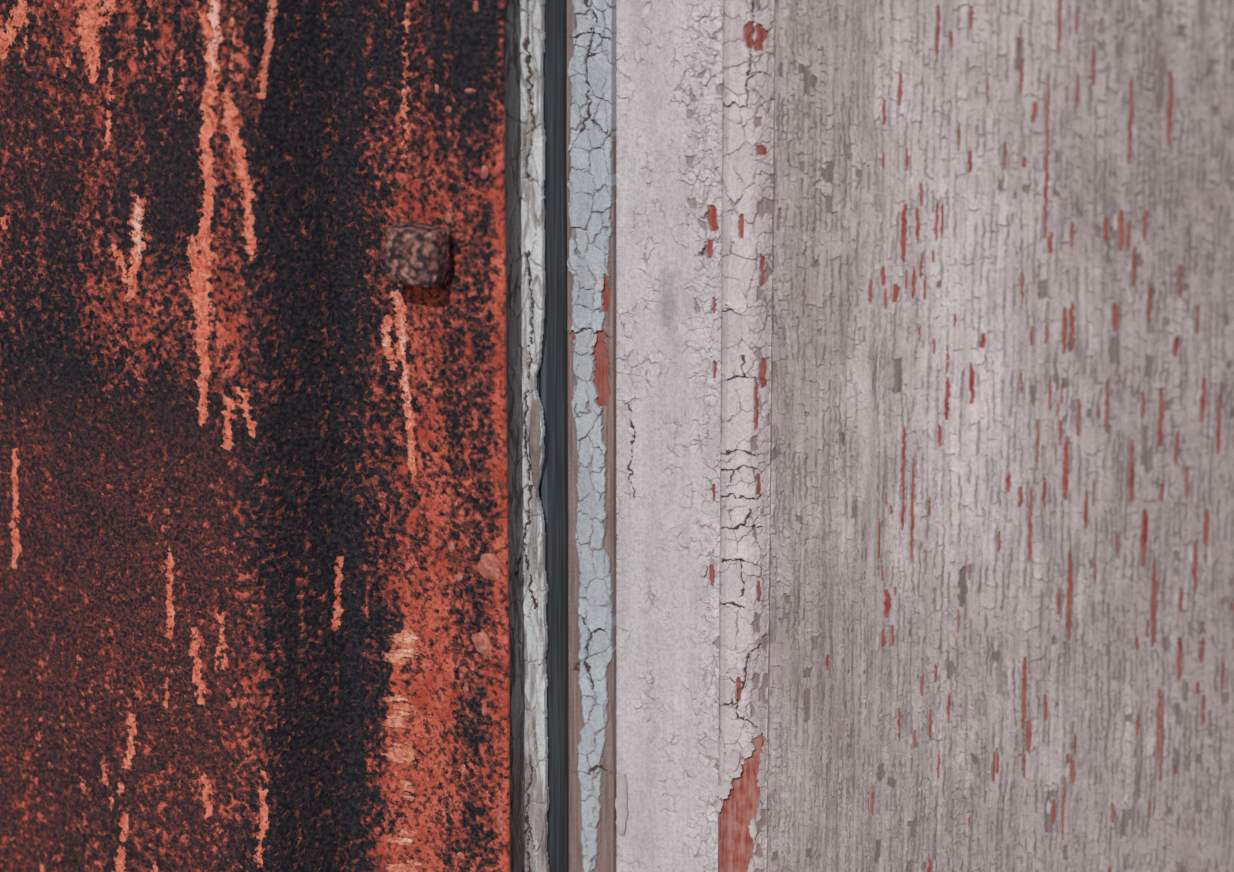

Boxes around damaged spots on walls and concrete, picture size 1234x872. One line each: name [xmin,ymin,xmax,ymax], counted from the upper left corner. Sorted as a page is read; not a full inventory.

rust [54,0,118,149]
crack [724,0,761,108]
rust [111,192,148,302]
rust [186,0,257,451]
peeling [868,184,948,309]
rust [380,284,418,481]
peeling [571,330,610,407]
crack [727,355,746,380]
peeling [875,428,930,651]
peeling [1005,375,1121,561]
rust [74,713,137,872]
peeling [714,733,765,872]